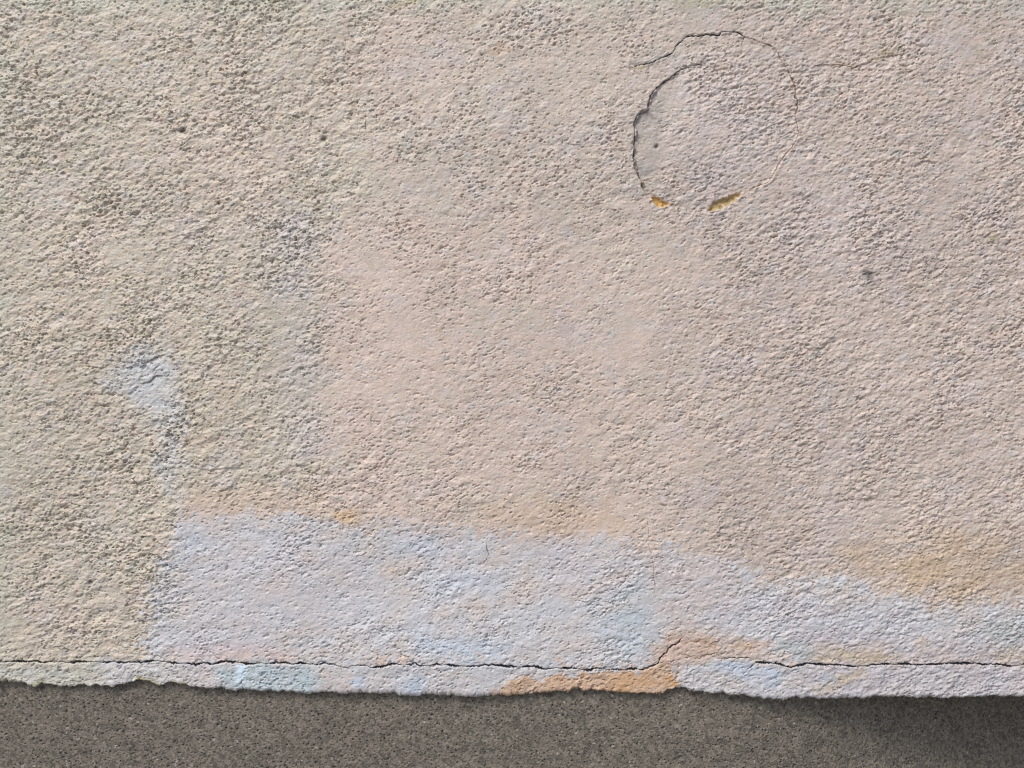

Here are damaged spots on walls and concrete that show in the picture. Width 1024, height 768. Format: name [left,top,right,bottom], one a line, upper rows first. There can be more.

crack [632,31,906,194]
spalling [649,196,672,209]
spalling [706,190,744,214]
leakage [0,333,1024,701]
crack [0,634,1024,672]